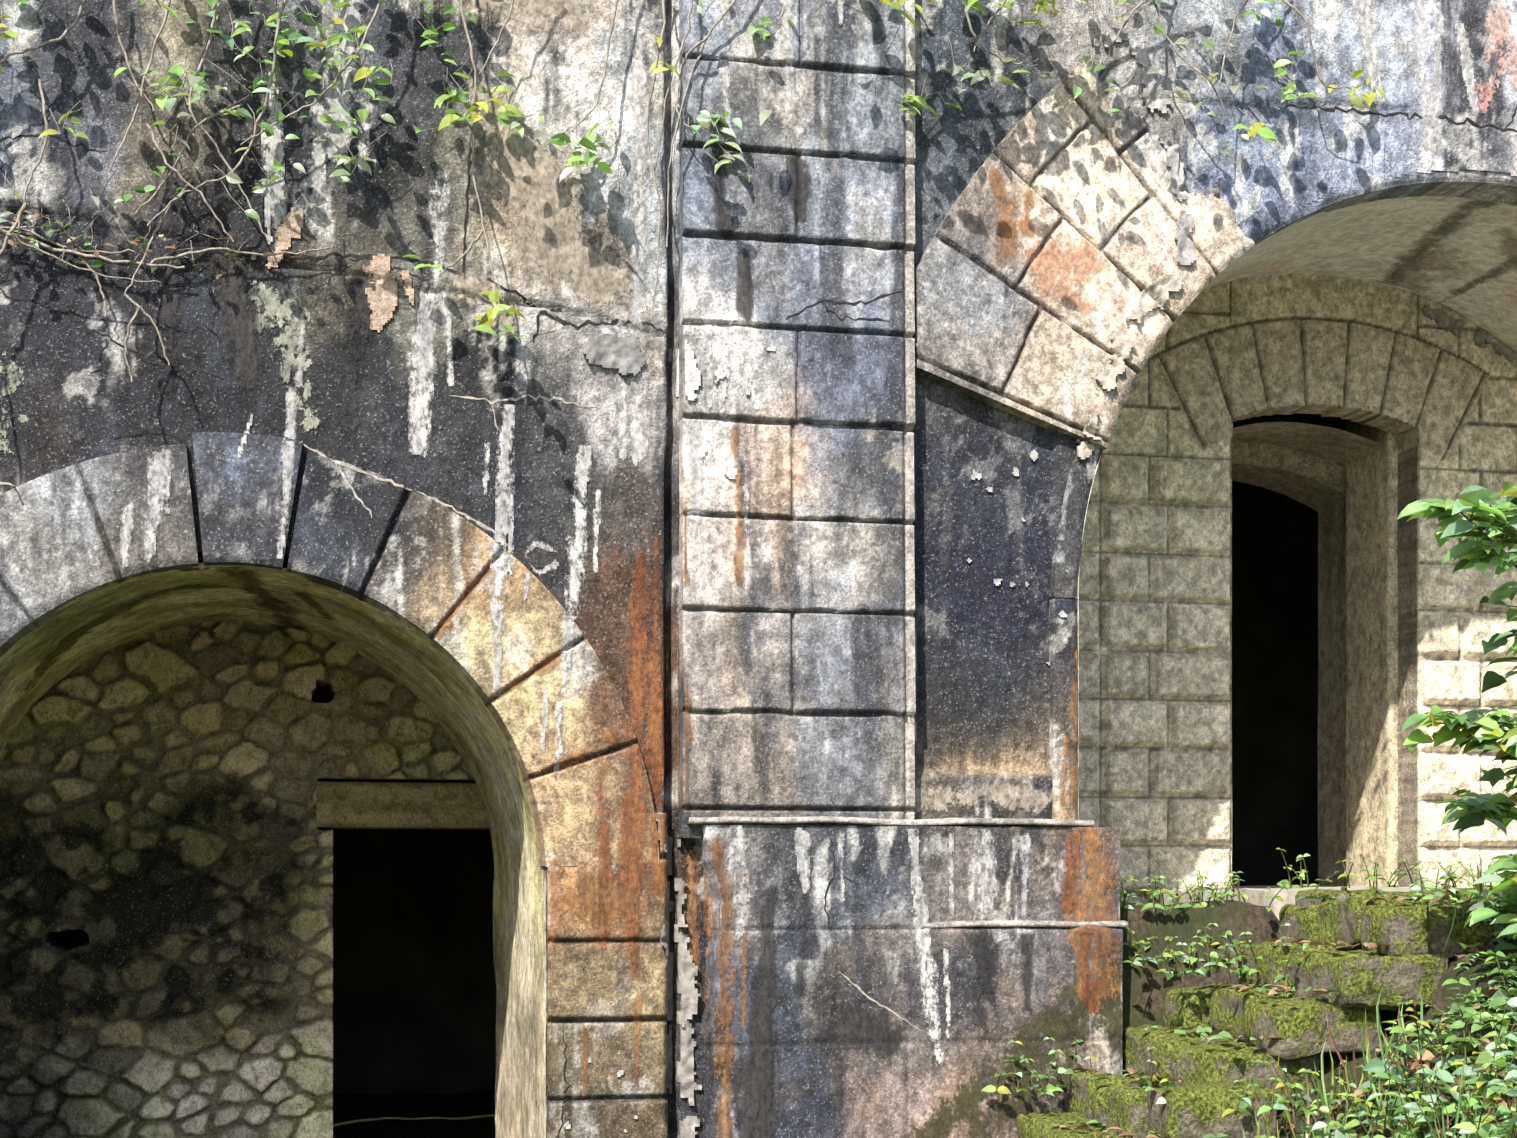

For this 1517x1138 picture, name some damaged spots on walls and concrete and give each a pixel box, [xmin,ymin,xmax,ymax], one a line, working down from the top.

crack [0,98,98,174]
crack [1280,104,1517,132]
spalling [251,207,303,269]
crack [0,139,662,379]
spalling [363,253,414,333]
damp [407,171,454,457]
damp [277,319,305,559]
damp [120,450,171,568]
corrosion [434,555,501,640]
corrosion [498,650,565,698]
corrosion [549,537,693,1085]
damp [908,829,951,1064]